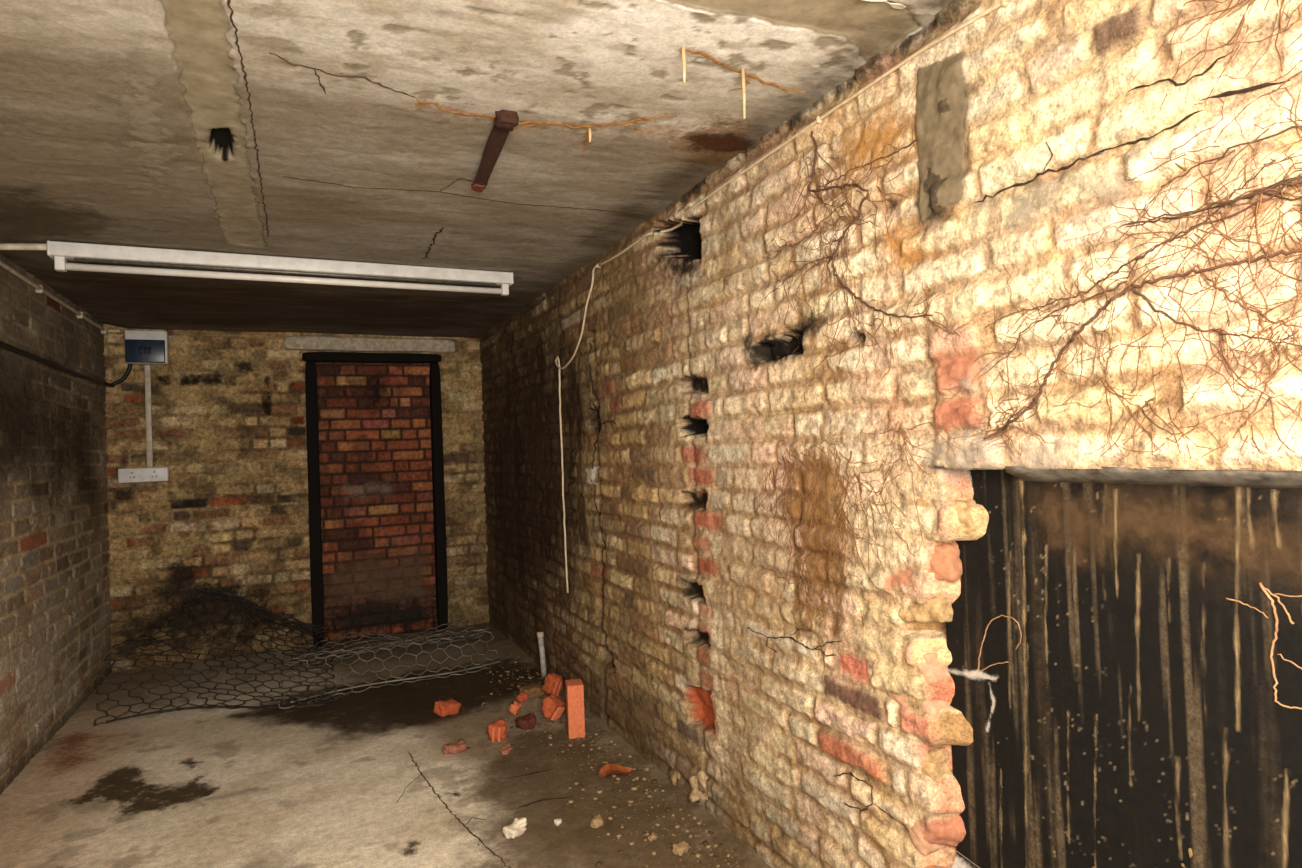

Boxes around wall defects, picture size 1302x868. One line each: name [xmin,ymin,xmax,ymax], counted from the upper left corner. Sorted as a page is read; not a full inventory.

peeling [865,0,906,9]
crack [679,46,806,119]
peeling [96,53,185,178]
crack [227,0,671,238]
rust [664,120,752,163]
crack [974,50,1290,203]
crack [422,227,444,260]
spalling [682,375,709,394]
spalling [682,415,709,437]